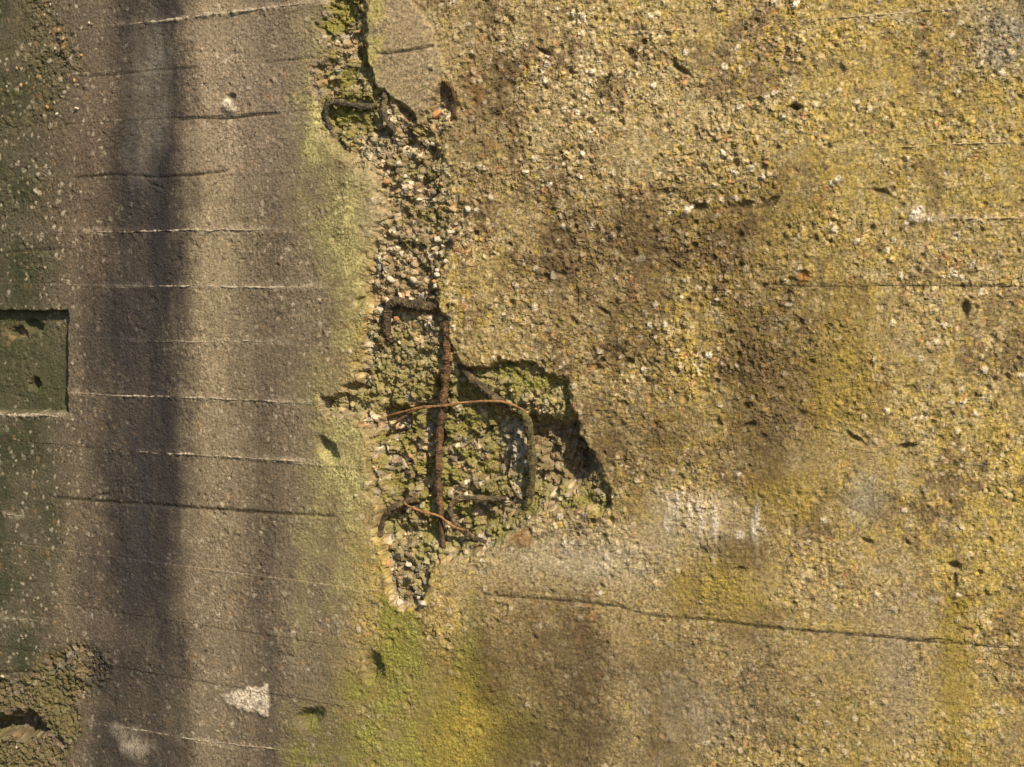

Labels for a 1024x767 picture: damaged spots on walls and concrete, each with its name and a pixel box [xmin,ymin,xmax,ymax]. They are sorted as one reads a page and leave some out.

spalling [310,0,613,618]
crack [486,594,1024,649]
spalling [0,638,117,767]